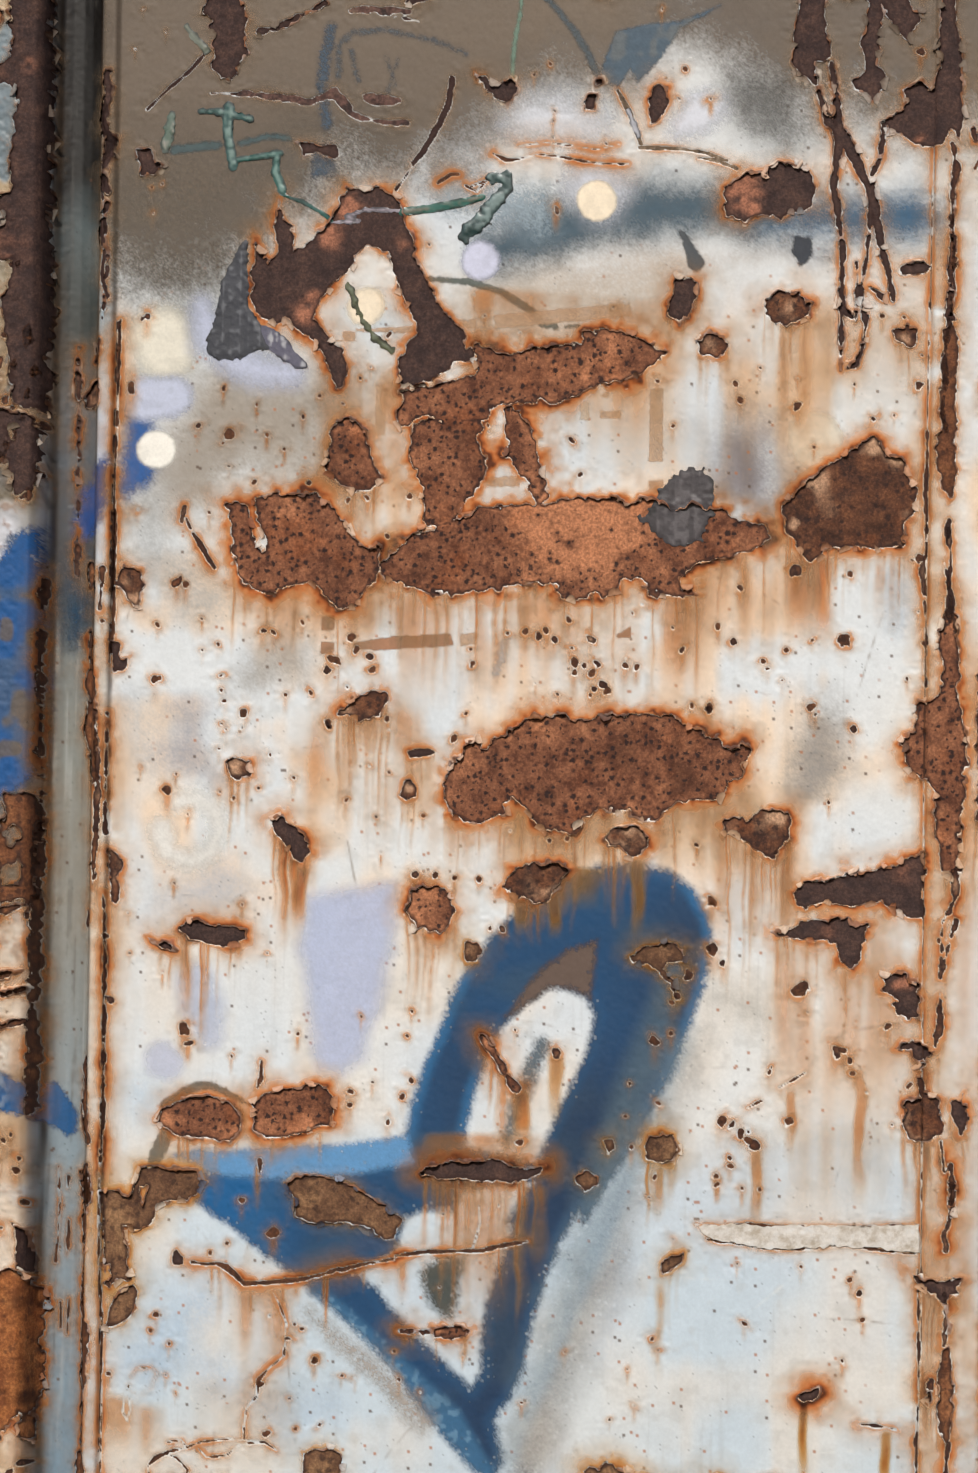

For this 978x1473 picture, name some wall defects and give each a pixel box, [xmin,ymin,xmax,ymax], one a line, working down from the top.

corrosion [208,0,978,1473]